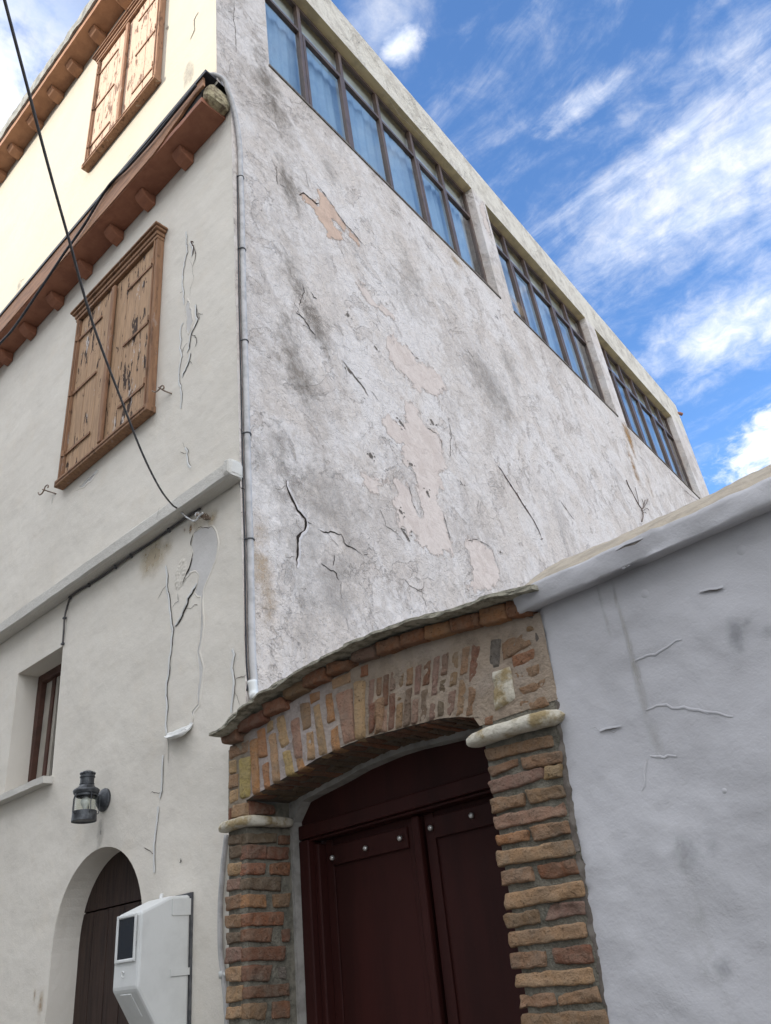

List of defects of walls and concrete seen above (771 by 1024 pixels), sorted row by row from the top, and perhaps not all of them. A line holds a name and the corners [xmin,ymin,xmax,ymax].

peeling [298,187,363,247]
crack [178,231,201,409]
crack [275,480,367,598]
peeling [464,537,502,594]
crack [498,465,543,540]
crack [145,555,197,873]